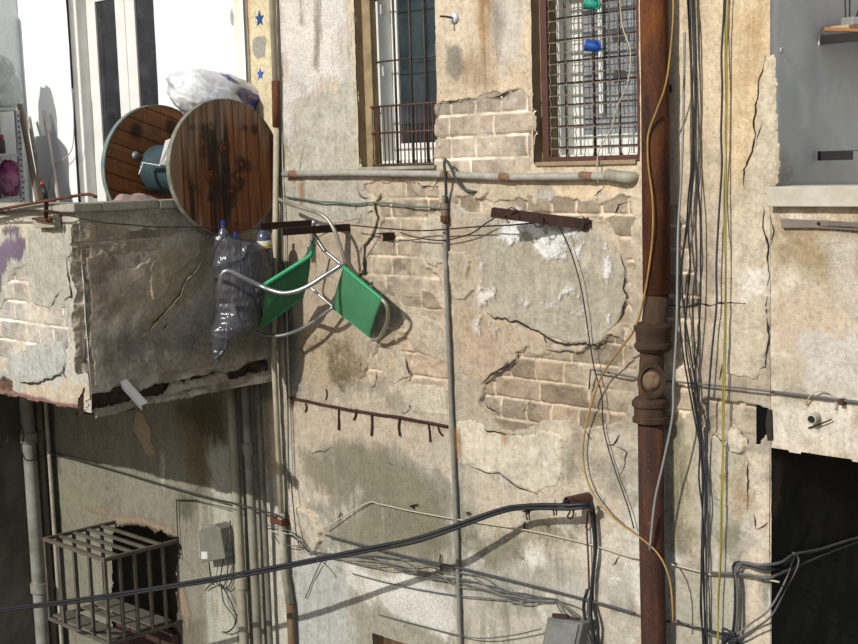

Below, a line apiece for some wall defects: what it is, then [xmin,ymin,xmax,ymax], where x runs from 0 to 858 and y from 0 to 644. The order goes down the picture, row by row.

crack [743,61,765,188]
peeling [0,222,272,419]
crack [143,263,201,337]
crack [355,189,381,277]
spalling [288,89,636,494]
crack [488,256,627,347]
spalling [663,205,702,429]
water stain [303,444,446,561]
peeling [701,397,756,512]
water stain [346,536,630,642]